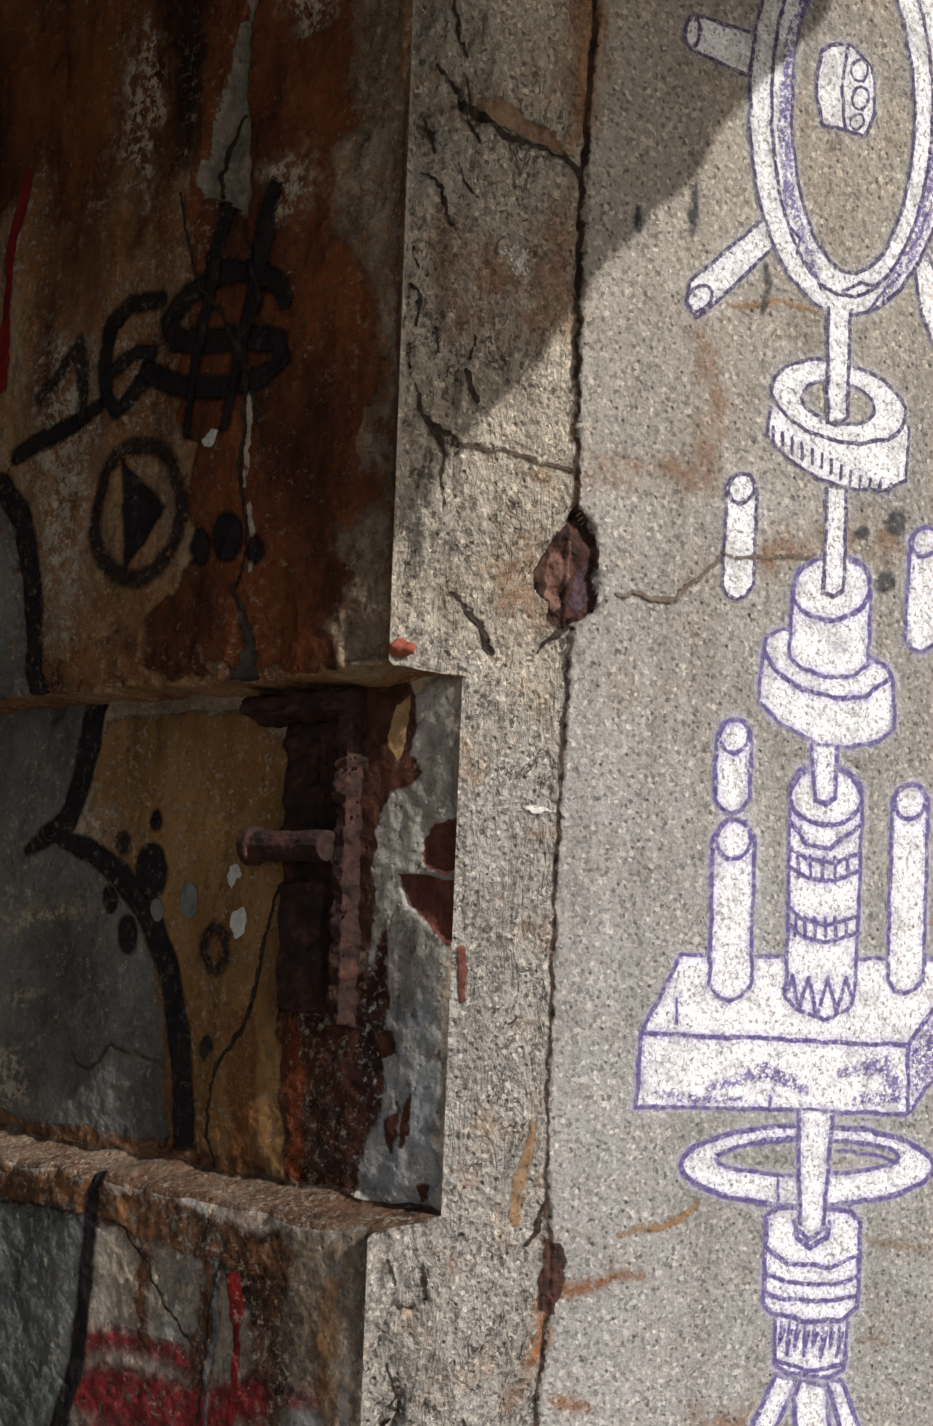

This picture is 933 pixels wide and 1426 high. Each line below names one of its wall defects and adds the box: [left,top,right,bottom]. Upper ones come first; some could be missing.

spalling [195,0,258,217]
corrosion [123,0,391,683]
crack [416,0,601,520]
crack [448,591,495,656]
spalling [533,508,600,626]
corrosion [0,682,422,1195]
flaking render [350,676,467,1210]
crack [524,623,576,1247]
corrosion [0,1163,296,1426]
corrosion [315,1287,336,1426]
flaking render [284,1229,369,1426]
crack [534,1311,550,1426]